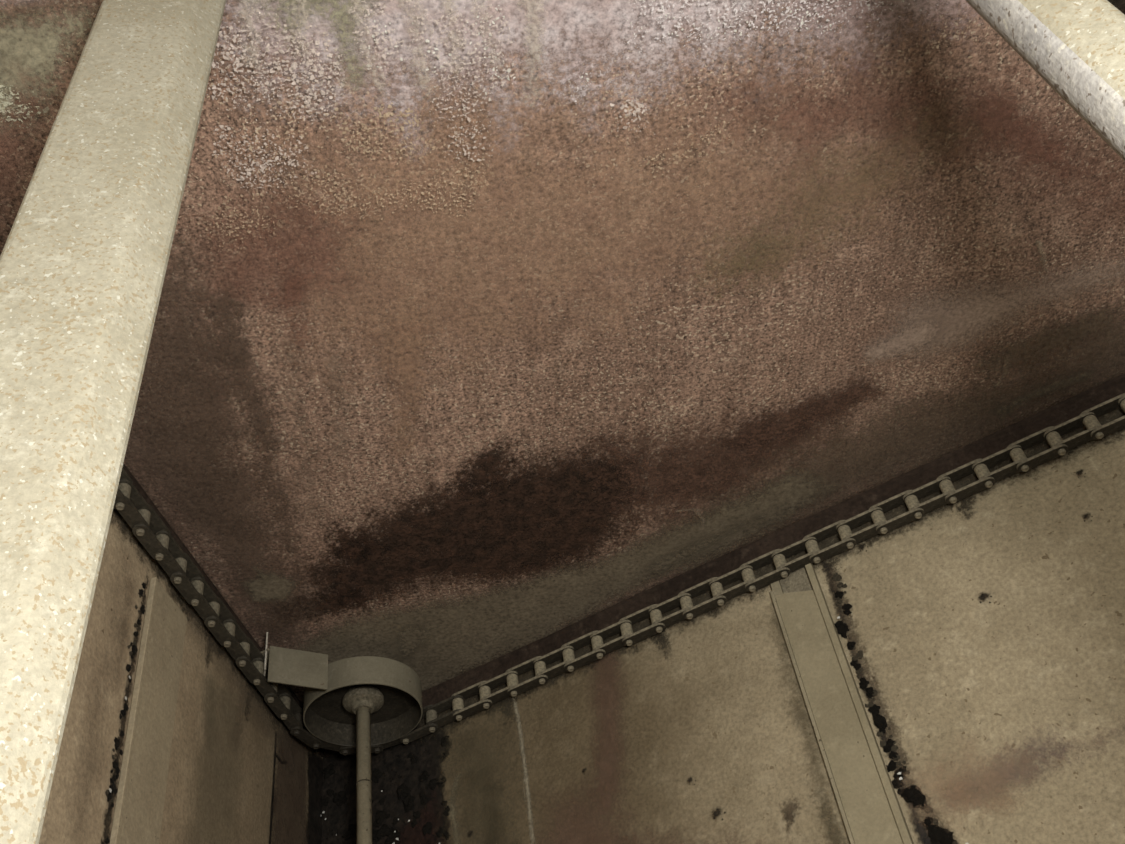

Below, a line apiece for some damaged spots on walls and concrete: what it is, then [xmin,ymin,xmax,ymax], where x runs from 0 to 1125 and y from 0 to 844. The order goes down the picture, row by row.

leakage [125,240,1125,691]